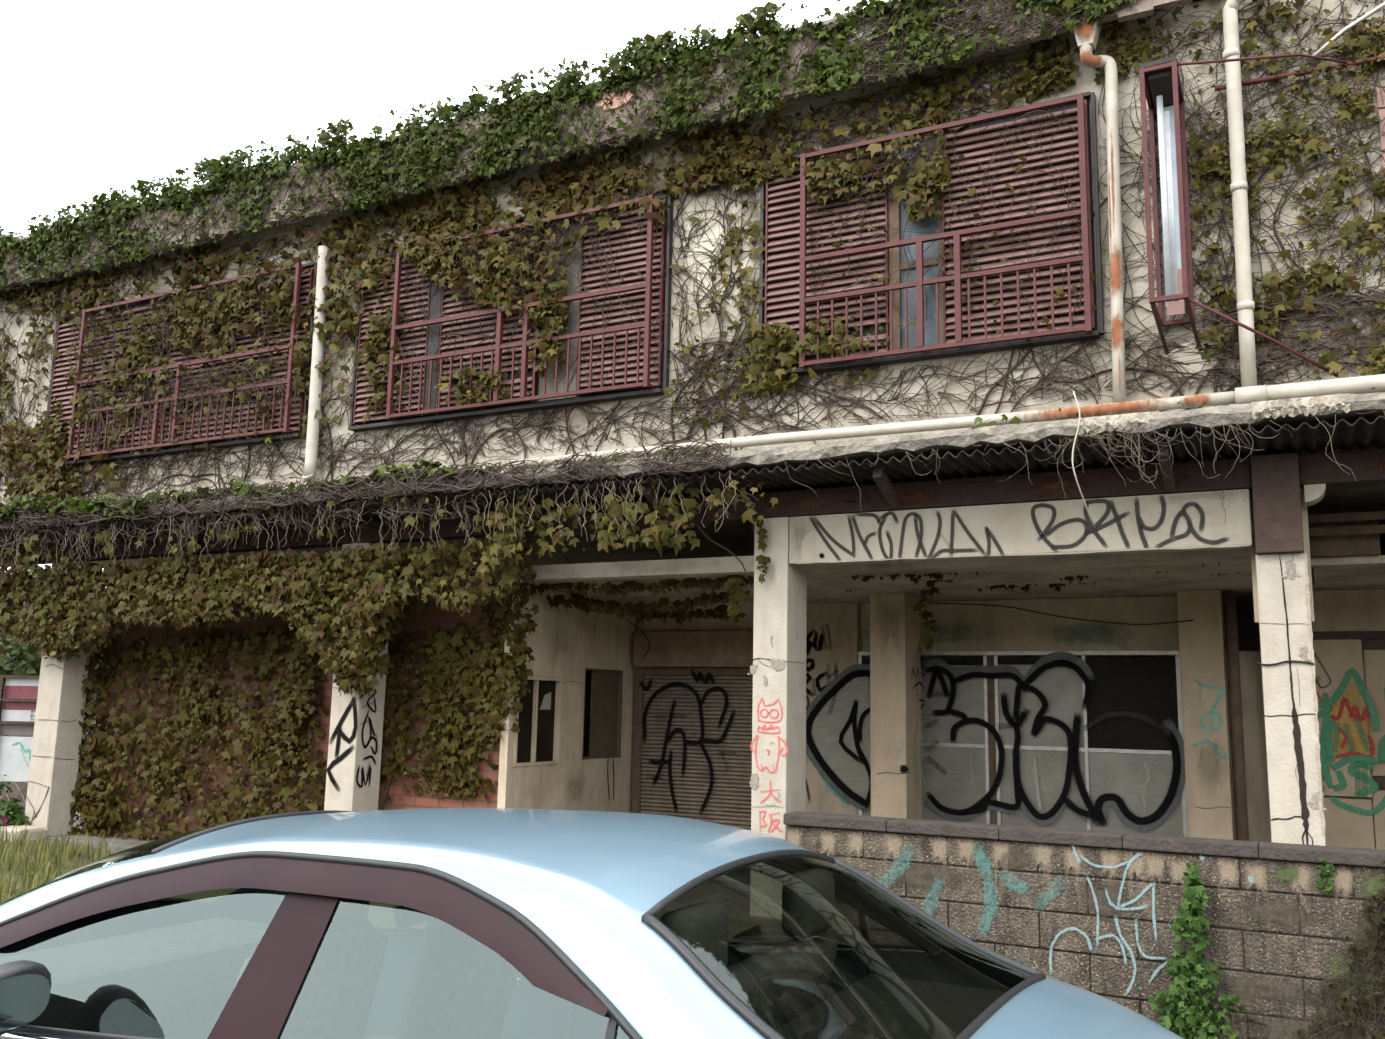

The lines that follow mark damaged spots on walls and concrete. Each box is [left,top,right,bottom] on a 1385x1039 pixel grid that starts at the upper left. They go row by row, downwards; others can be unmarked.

rust [1076,16,1101,68]
rust [1109,148,1122,291]
rust [1111,315,1124,384]
rust [1033,400,1153,420]
rust [1184,395,1209,405]
crack [1263,554,1315,845]